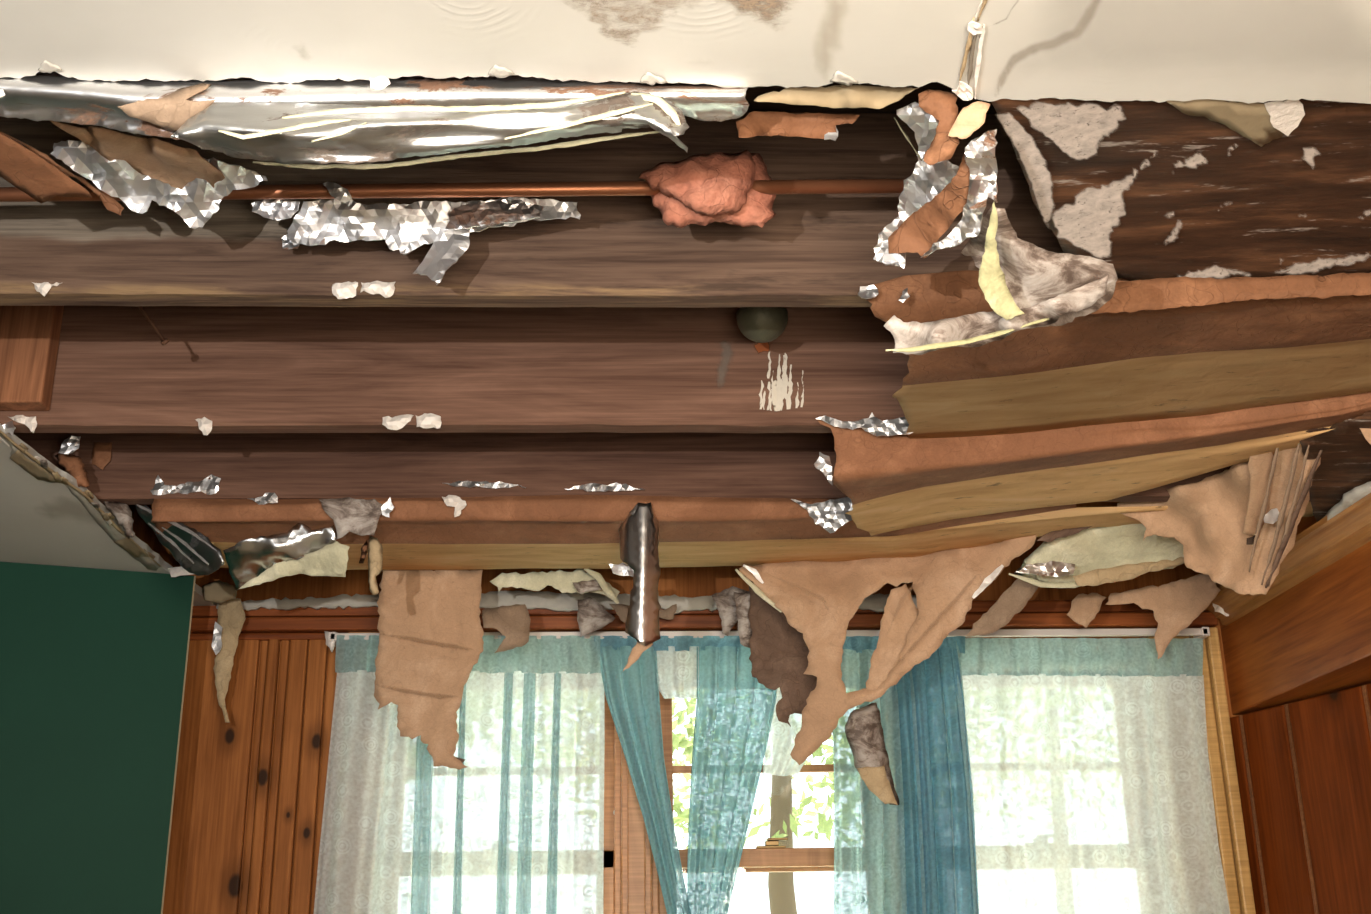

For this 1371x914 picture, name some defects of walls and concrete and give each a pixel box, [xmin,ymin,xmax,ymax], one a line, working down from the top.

flaking render [38,60,62,73]
flaking render [369,76,390,90]
flaking render [488,64,514,78]
flaking render [640,72,667,85]
flaking render [830,71,858,86]
flaking render [952,81,973,101]
peeling [10,443,68,485]
peeling [84,490,153,558]